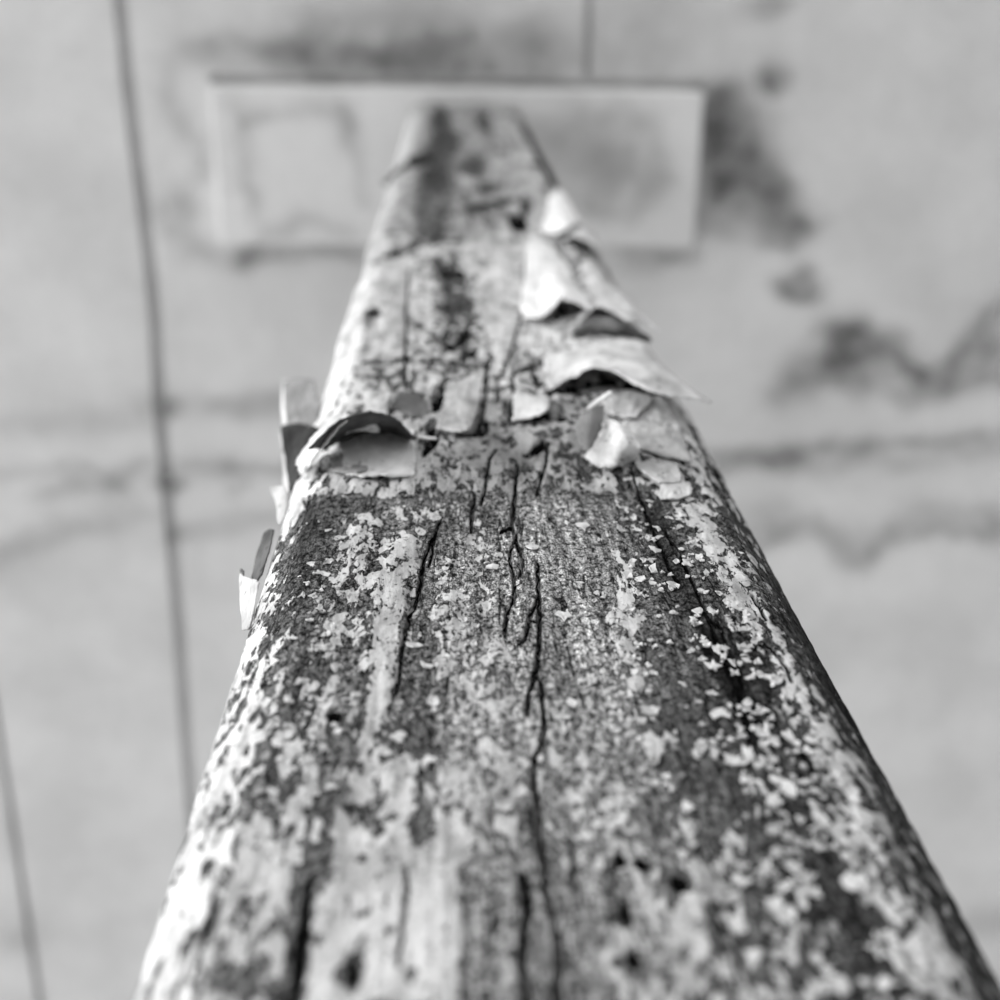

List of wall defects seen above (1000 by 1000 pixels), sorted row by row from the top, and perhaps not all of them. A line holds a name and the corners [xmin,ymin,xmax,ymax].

crack [382,155,434,186]
crack [466,197,606,269]
damp [702,88,806,232]
damp [823,330,864,373]
peeling [239,374,485,631]
peeling [512,189,783,694]
peeling [295,529,364,662]
crack [362,231,755,1000]
crack [750,596,792,683]
peeling [260,722,343,772]
peeling [692,697,962,1000]
crack [193,890,215,976]